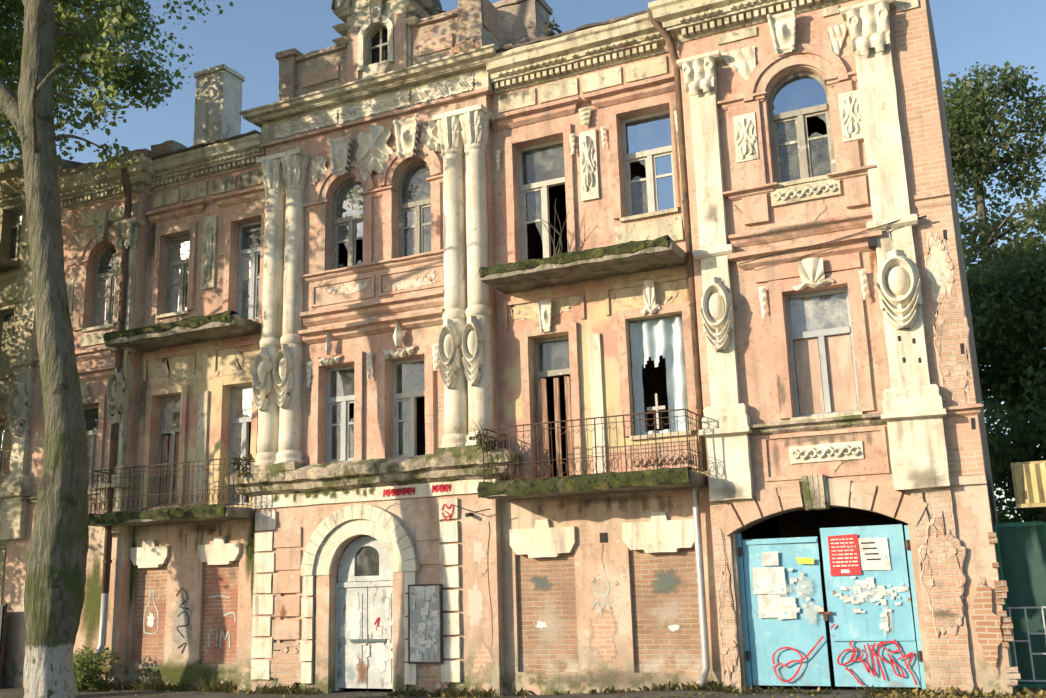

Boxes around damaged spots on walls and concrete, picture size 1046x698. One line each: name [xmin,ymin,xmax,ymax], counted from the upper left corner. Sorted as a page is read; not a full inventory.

flaking render [924,230,976,430]
leakage [273,488,375,502]
flaking render [717,565,738,683]
flaking render [918,510,1021,685]